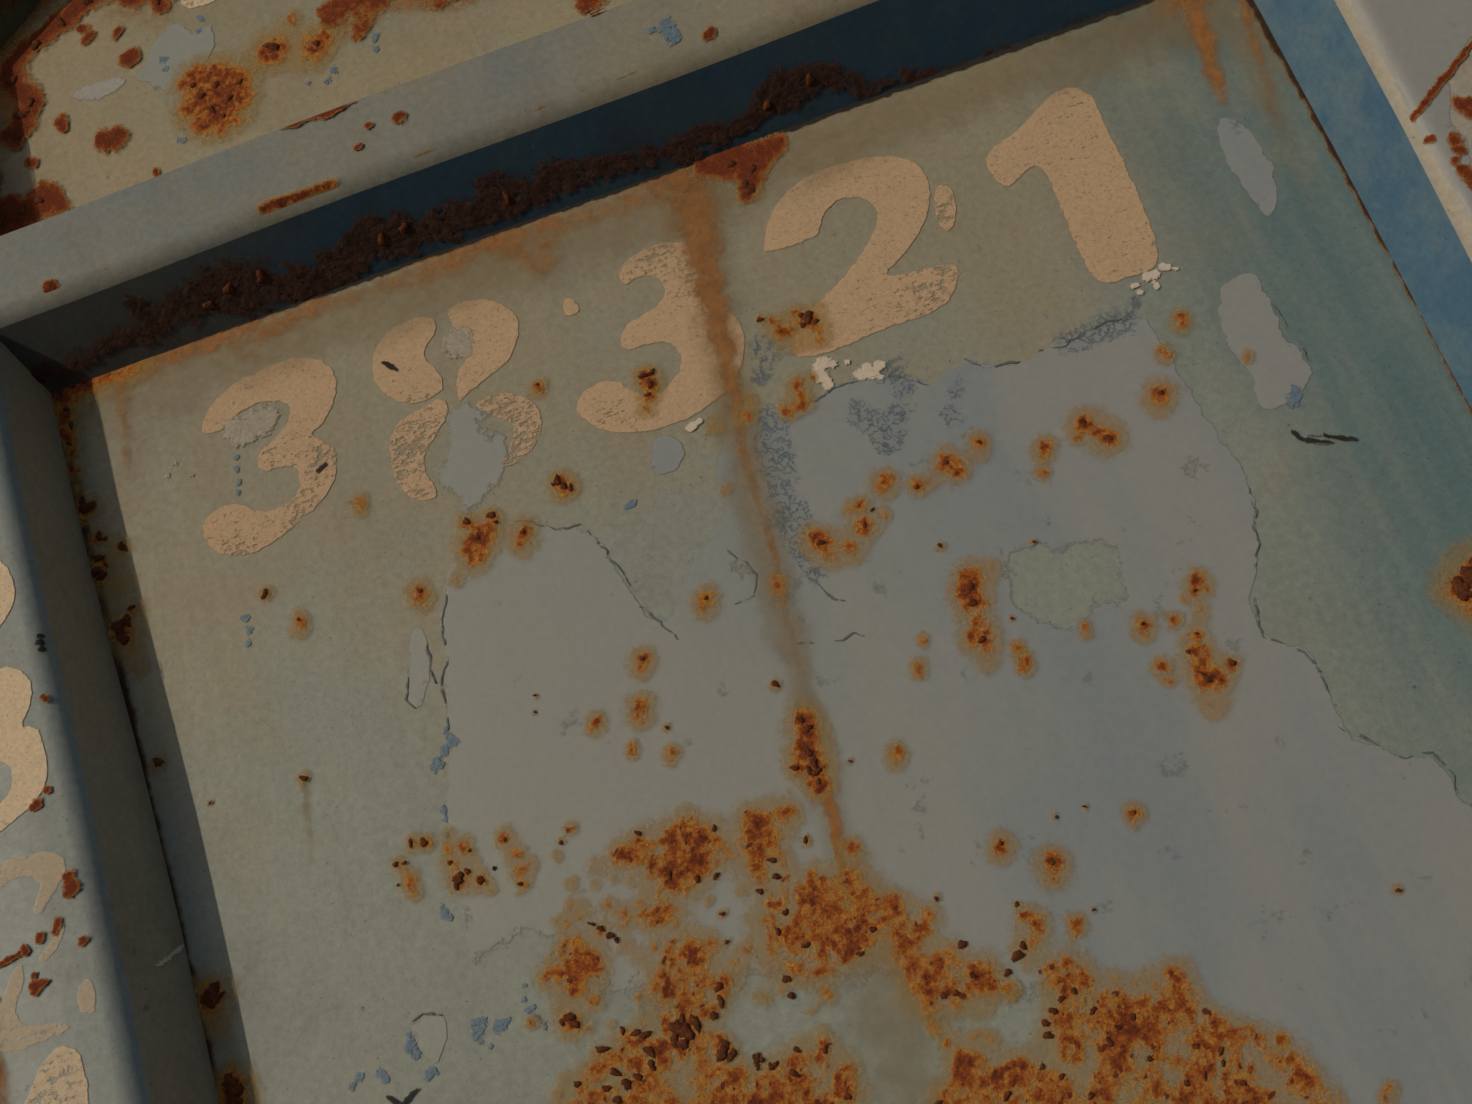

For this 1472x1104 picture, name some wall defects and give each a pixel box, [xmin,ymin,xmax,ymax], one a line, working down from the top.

rust [1167,0,1224,99]
rust [1174,311,1189,330]
rust [1147,382,1173,410]
rust [29,0,1152,1104]
rust [1439,552,1472,621]
peeling [404,262,1472,1104]
rust [1134,570,1240,708]
rust [539,706,1341,1104]
rust [20,916,62,997]